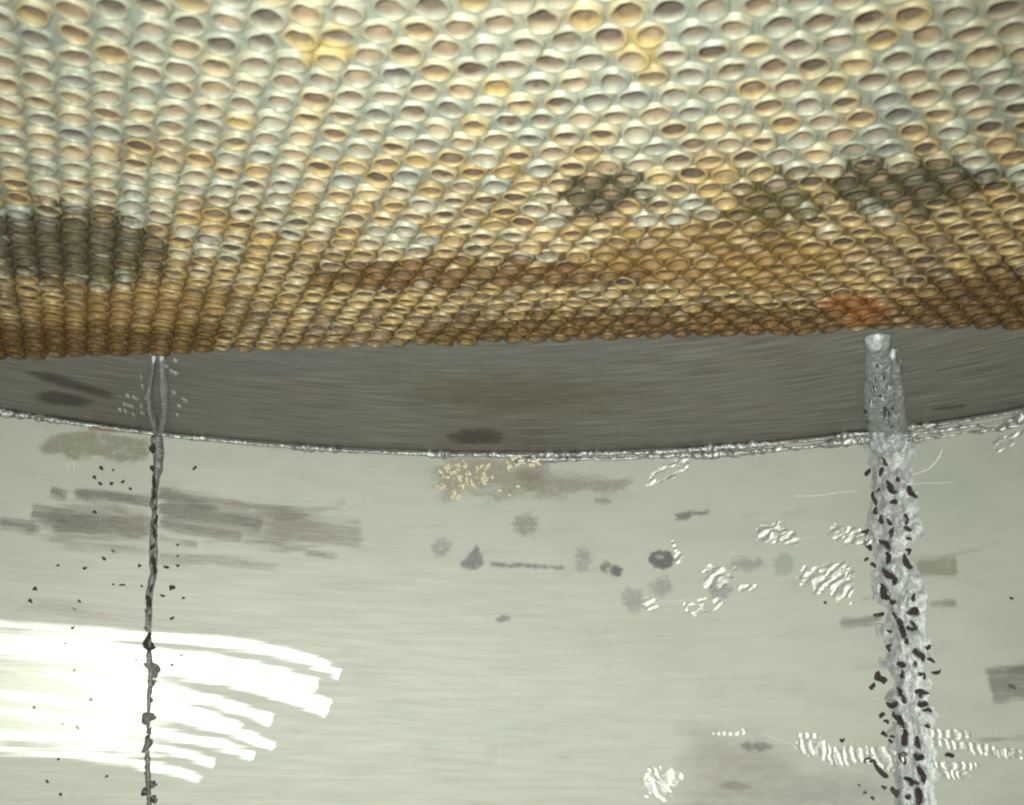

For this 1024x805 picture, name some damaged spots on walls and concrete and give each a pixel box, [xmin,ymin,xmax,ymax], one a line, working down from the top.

leakage [556,165,652,221]
leakage [0,198,172,289]
rust [393,256,1024,347]